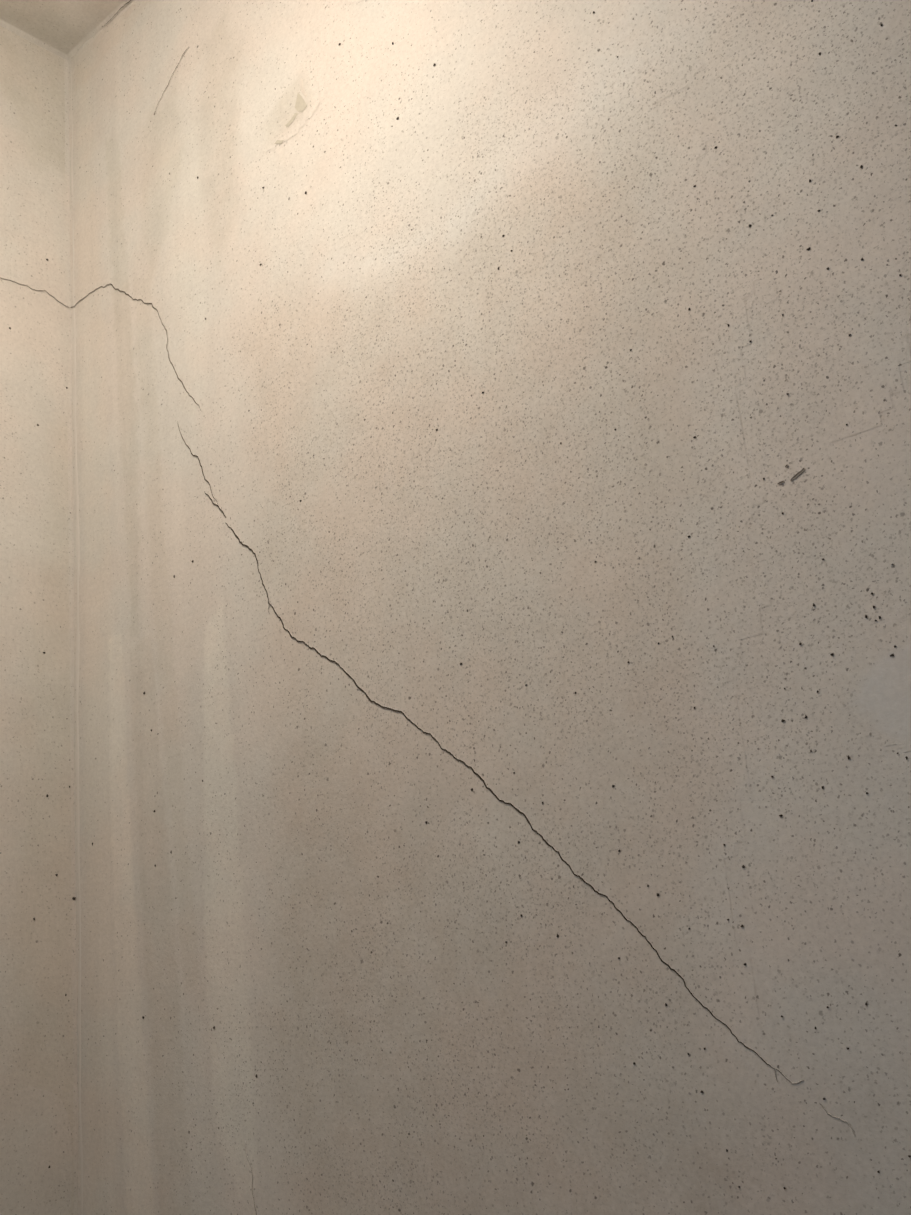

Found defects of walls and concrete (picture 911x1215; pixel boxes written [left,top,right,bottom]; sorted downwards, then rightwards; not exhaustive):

crack [0,277,856,1137]